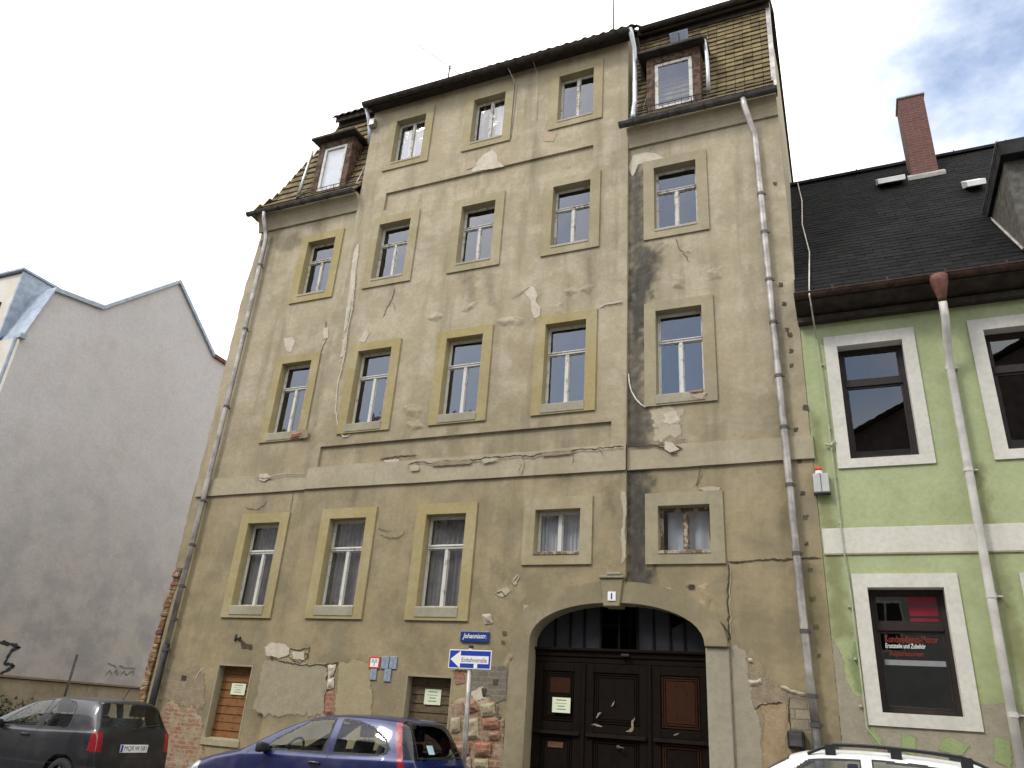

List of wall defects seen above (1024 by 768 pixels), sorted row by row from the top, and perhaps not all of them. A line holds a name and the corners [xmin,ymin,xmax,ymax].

flaking render [466,150,504,172]
flaking render [629,152,664,176]
water stain [628,164,657,448]
crack [407,441,682,472]
flaking render [650,405,685,445]
water stain [627,470,653,584]
crack [666,557,821,640]
flaking render [265,642,290,658]
flaking render [159,666,206,768]
flaking render [448,666,508,768]
flaking render [748,657,811,768]
peeling [817,640,1024,768]